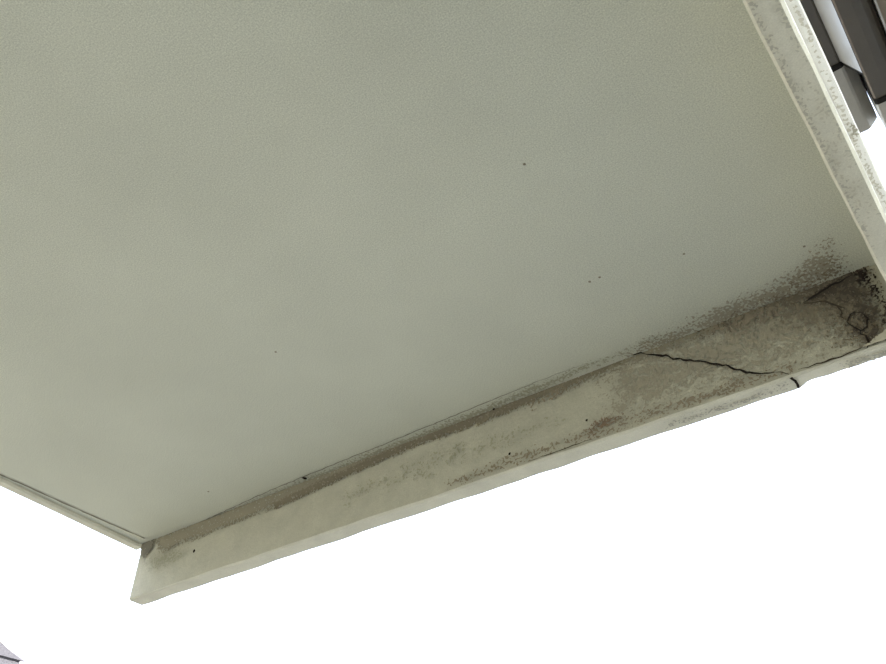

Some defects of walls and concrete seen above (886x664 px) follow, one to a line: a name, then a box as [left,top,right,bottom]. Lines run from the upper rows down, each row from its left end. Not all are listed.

crack [633,274,869,388]